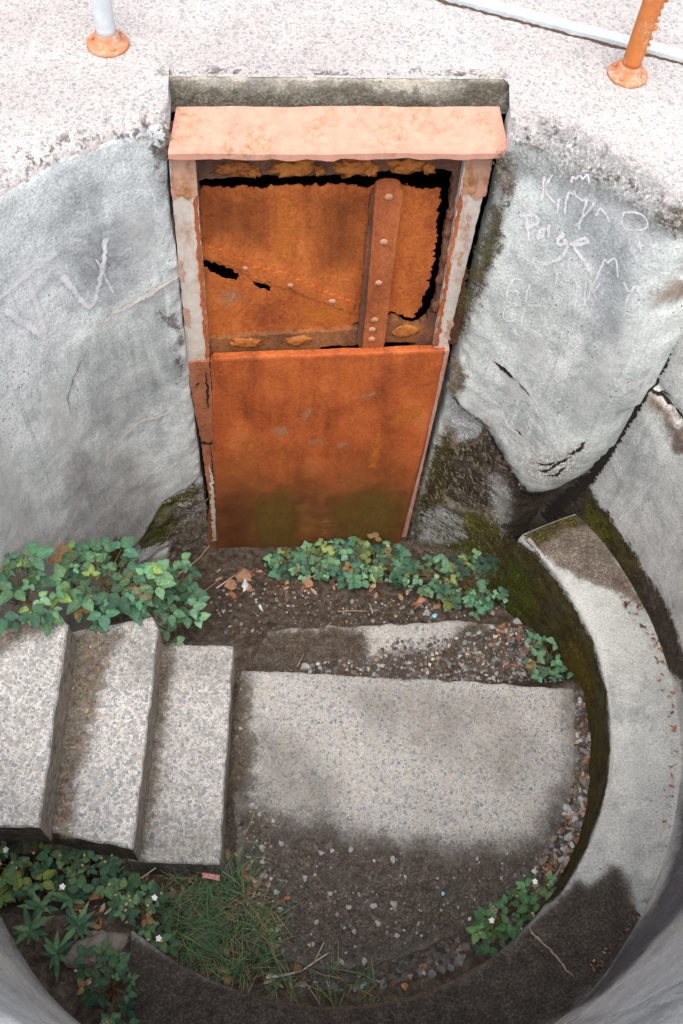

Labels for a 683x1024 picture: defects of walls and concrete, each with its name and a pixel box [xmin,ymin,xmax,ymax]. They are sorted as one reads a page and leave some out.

rust [210,158,436,179]
crack [451,397,546,463]
rust [336,491,398,541]
water stain [418,395,683,692]